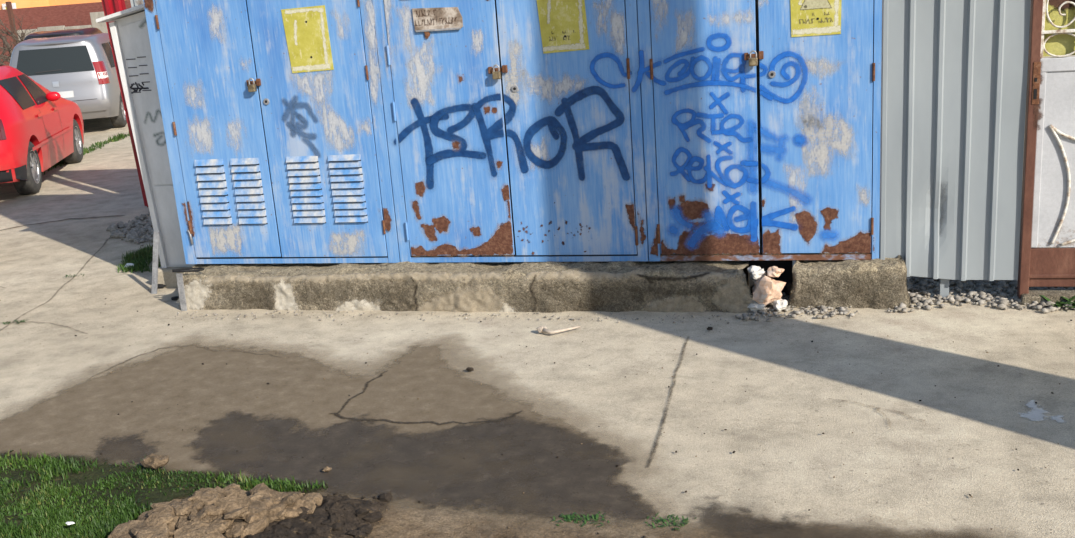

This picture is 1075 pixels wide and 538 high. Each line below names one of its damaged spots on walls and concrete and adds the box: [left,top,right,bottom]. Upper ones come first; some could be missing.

rust [1033,98,1043,130]
rust [383,208,392,231]
rust [411,181,590,256]
rust [626,184,781,256]
rust [795,207,838,244]
rust [822,232,875,254]
crack [330,371,521,425]
crack [647,338,688,467]
water stain [0,340,676,523]